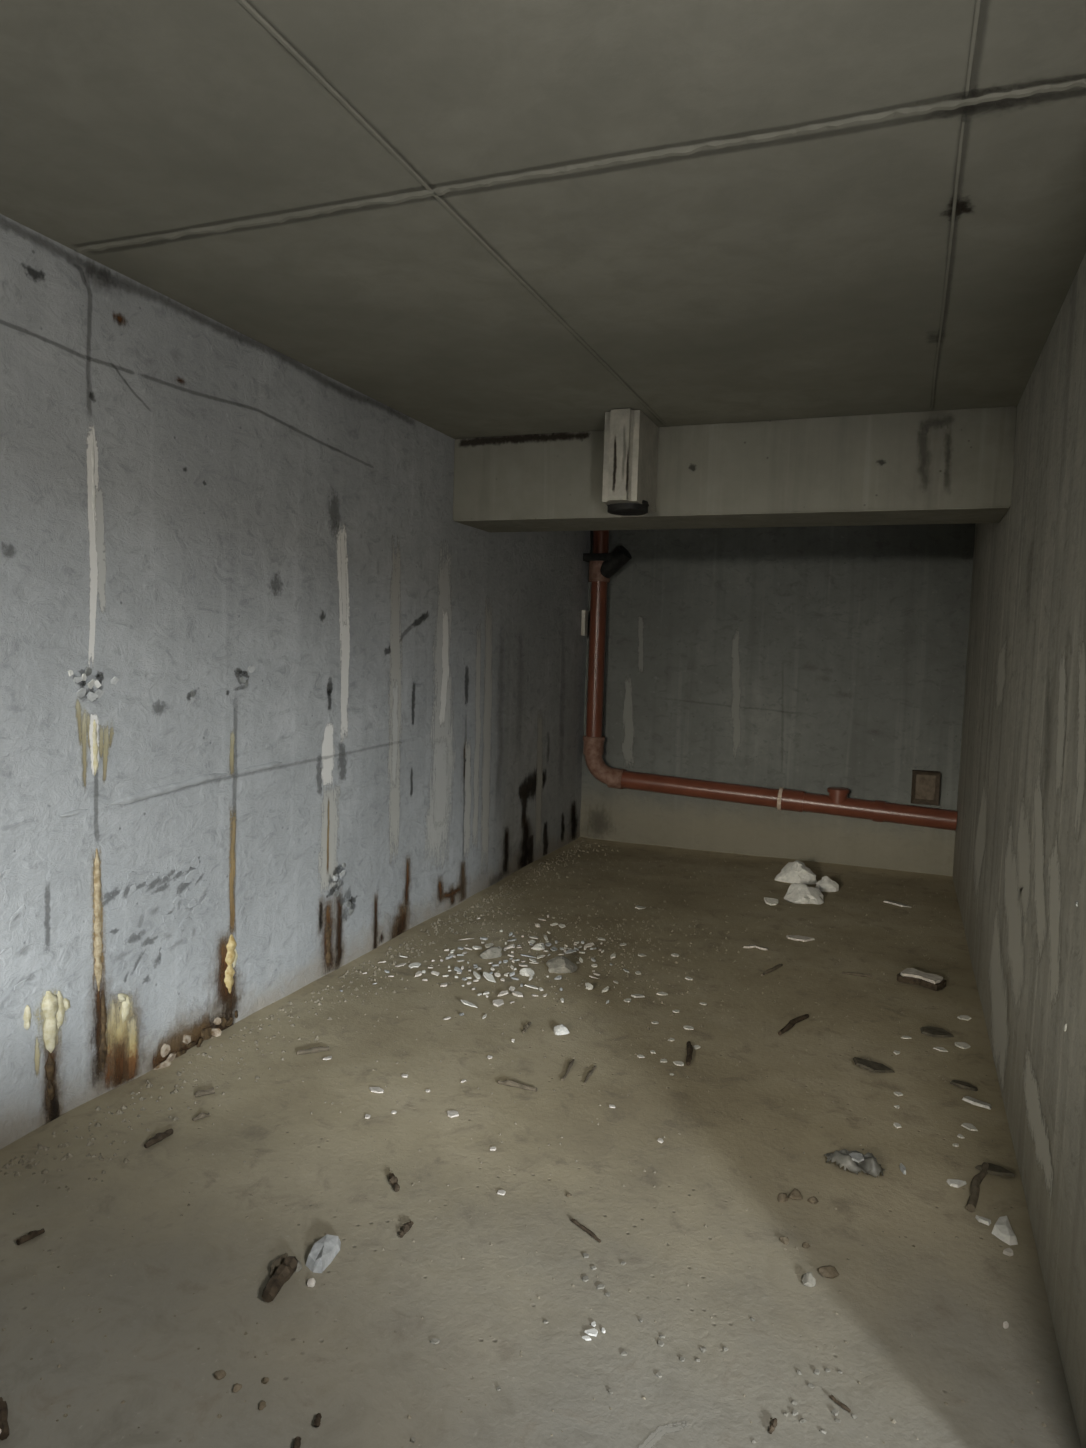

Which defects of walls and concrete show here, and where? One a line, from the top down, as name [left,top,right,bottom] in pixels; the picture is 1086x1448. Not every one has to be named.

spalling [68,667,119,702]
corrosion [75,699,114,787]
corrosion [318,682,342,970]
corrosion [93,848,138,1086]
corrosion [374,859,410,948]
corrosion [23,990,70,1122]